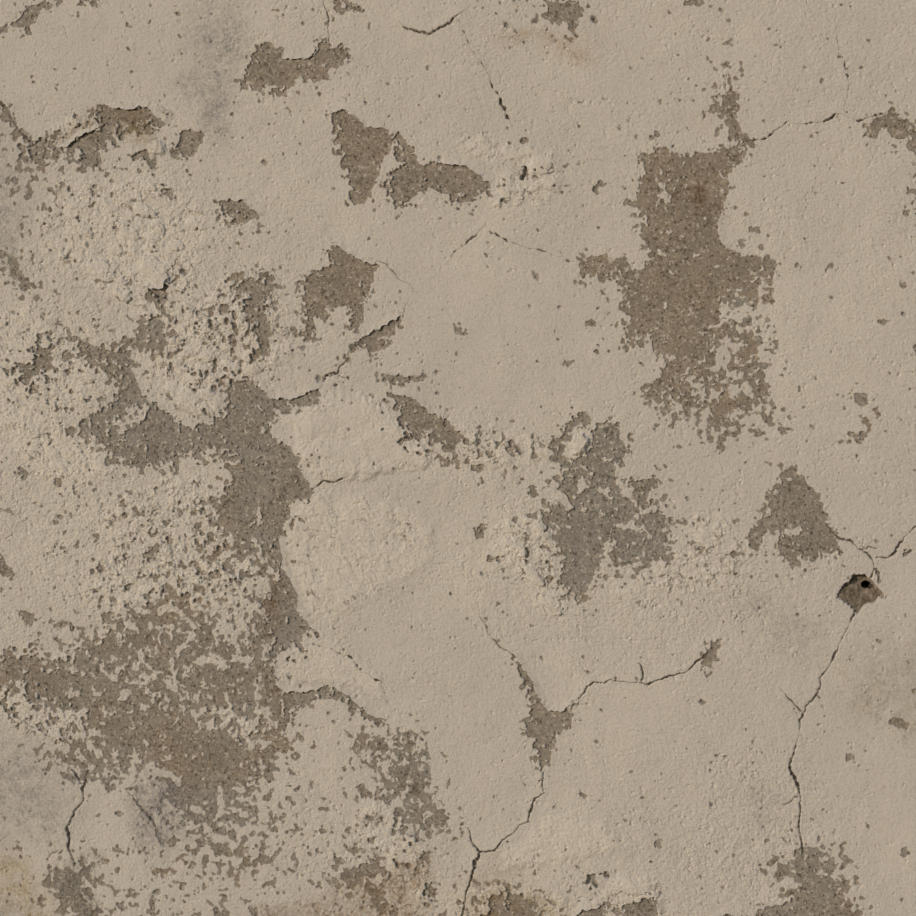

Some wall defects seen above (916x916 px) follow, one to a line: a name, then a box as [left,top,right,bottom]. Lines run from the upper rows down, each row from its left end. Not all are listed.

peeling [242,39,350,97]
peeling [330,99,495,209]
peeling [863,108,916,152]
peeling [297,213,460,452]
peeling [577,98,774,431]
peeling [71,316,389,754]
peeling [528,412,672,601]
peeling [747,465,843,562]
crack [825,523,916,578]
crack [580,654,707,698]
crack [780,613,855,858]
crack [461,773,544,916]